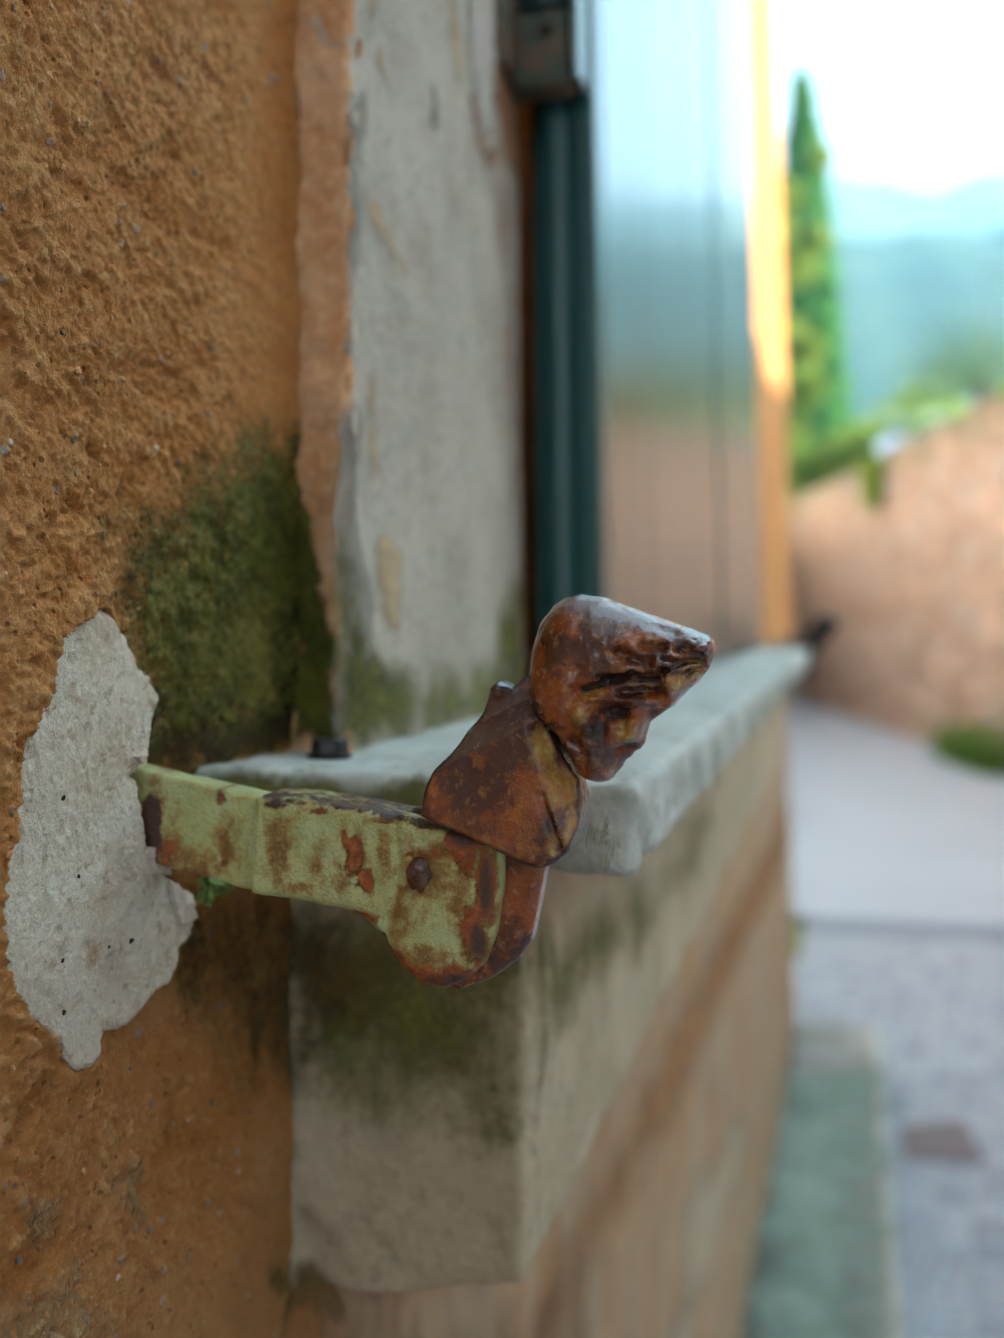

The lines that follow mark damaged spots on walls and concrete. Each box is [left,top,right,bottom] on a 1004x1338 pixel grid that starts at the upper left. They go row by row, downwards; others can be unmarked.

flaking render [2,610,199,1071]